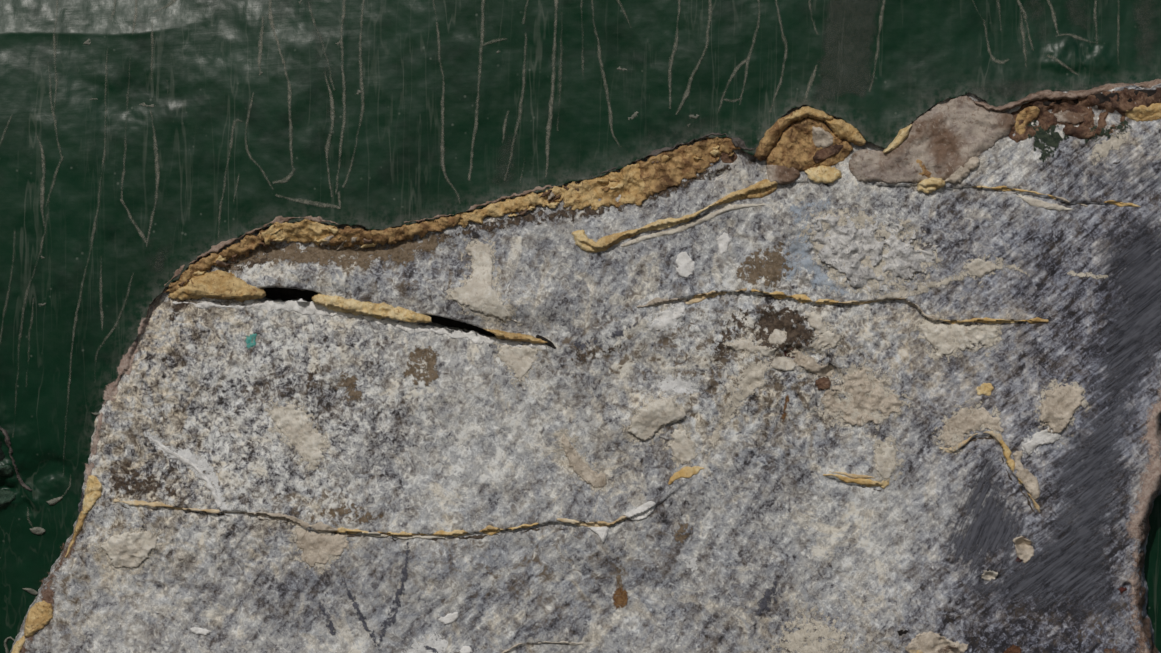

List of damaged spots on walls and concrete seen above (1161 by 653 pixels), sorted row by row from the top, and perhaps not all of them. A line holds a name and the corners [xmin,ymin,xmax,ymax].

peeling [961,79,1161,114]
peeling [1048,109,1087,127]
peeling [320,224,389,254]
crack [172,287,556,351]
peeling [768,329,787,345]
spalling [78,469,88,514]
spalling [10,586,45,653]